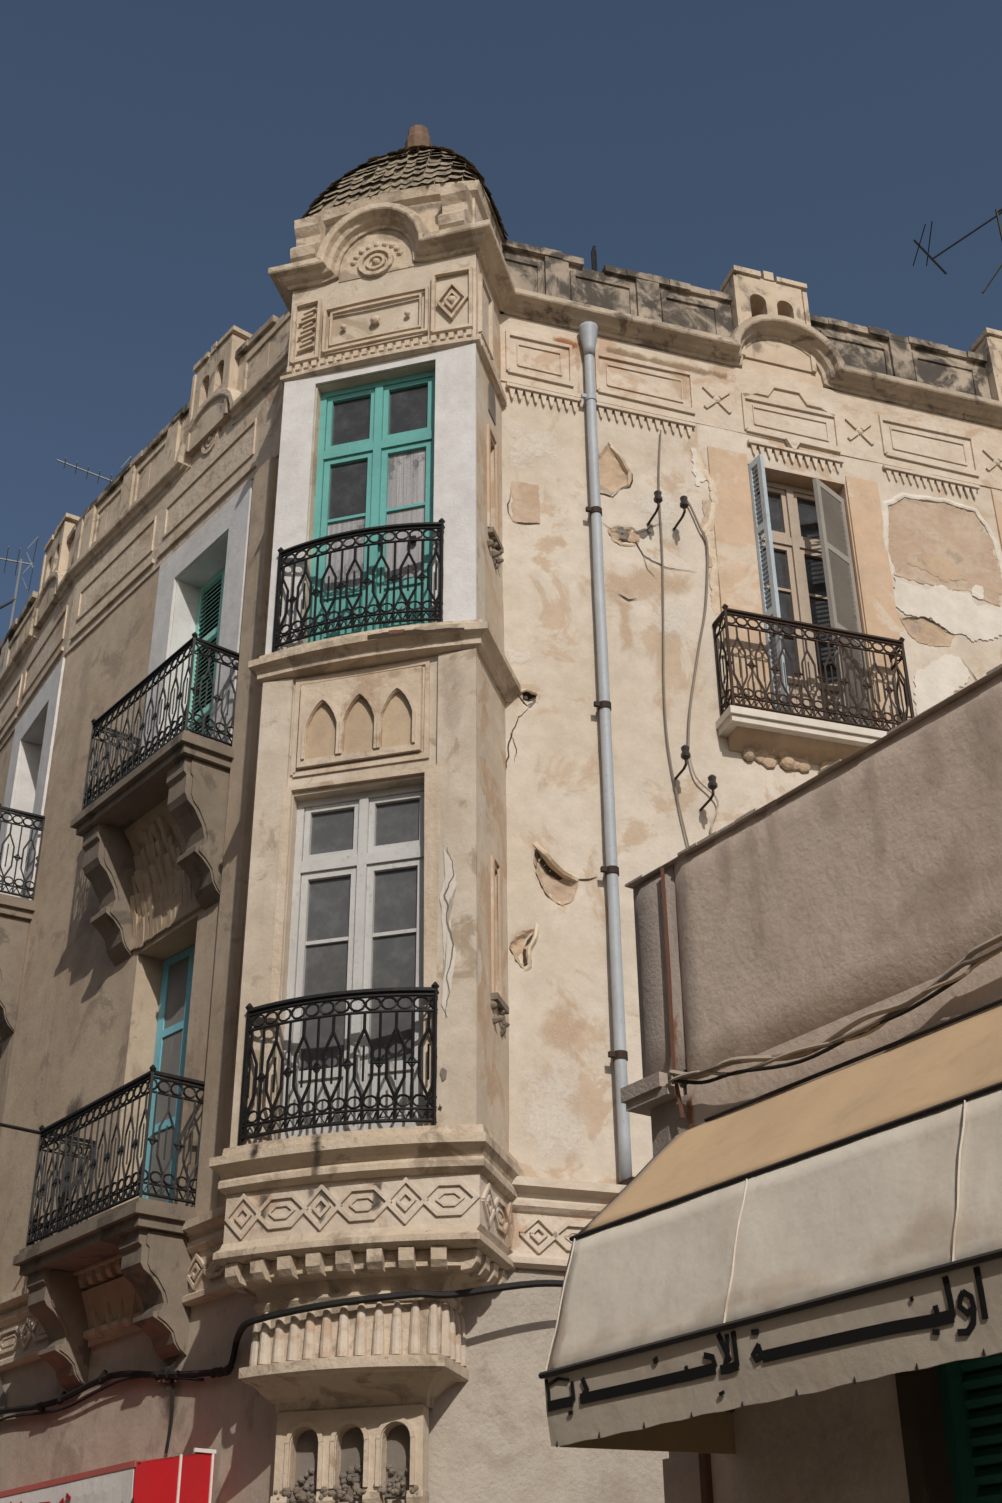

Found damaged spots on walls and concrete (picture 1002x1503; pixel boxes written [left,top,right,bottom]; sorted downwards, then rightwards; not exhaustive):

spalling [598,443,675,546]
peeling [882,492,1002,715]
spalling [532,841,596,905]
spalling [509,923,540,972]